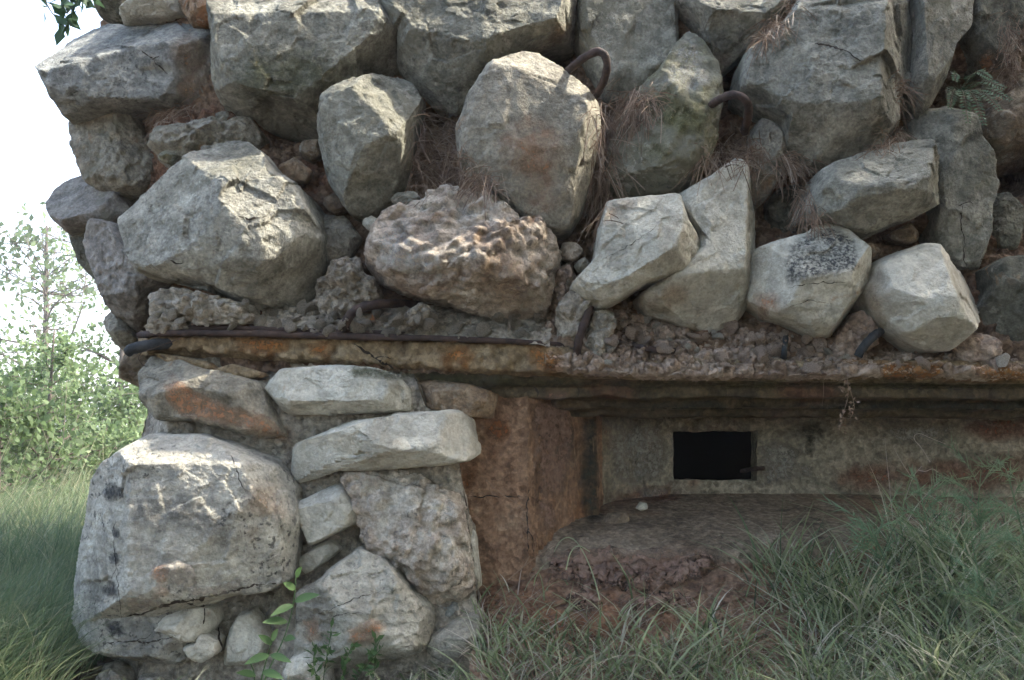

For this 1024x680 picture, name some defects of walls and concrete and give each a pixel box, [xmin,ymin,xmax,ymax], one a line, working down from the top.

crack [354,344,394,369]
crack [468,490,534,552]